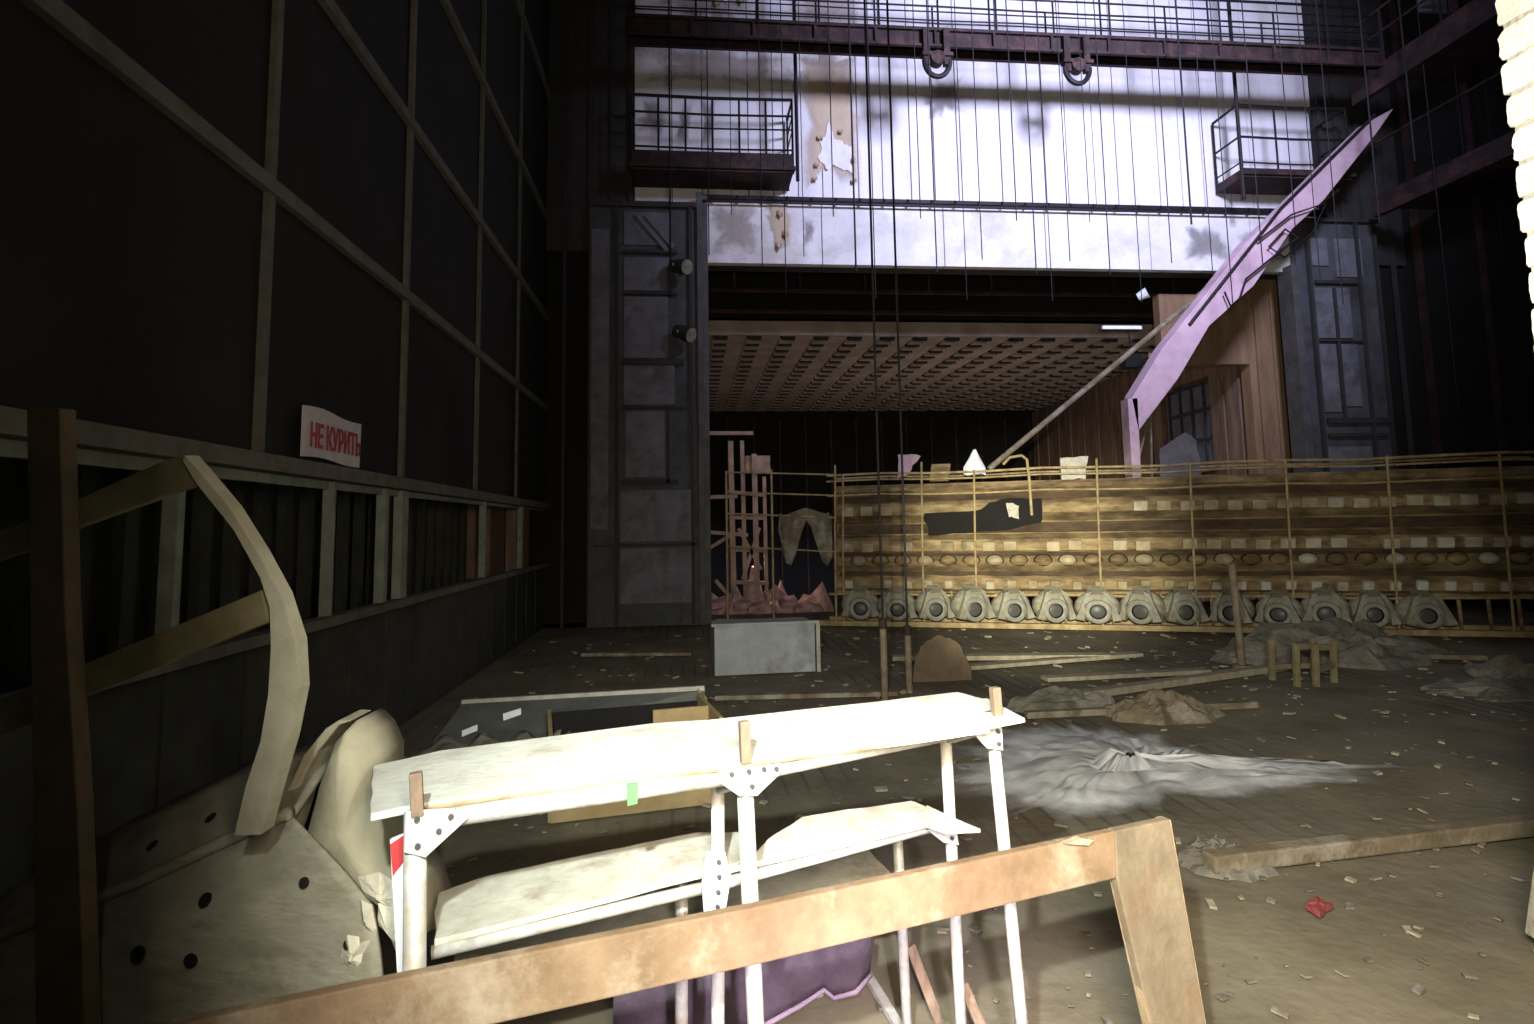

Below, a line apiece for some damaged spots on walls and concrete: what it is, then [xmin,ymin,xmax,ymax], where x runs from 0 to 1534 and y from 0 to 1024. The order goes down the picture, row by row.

peeling [808,64,857,183]
peeling [718,210,752,245]
peeling [768,204,790,250]